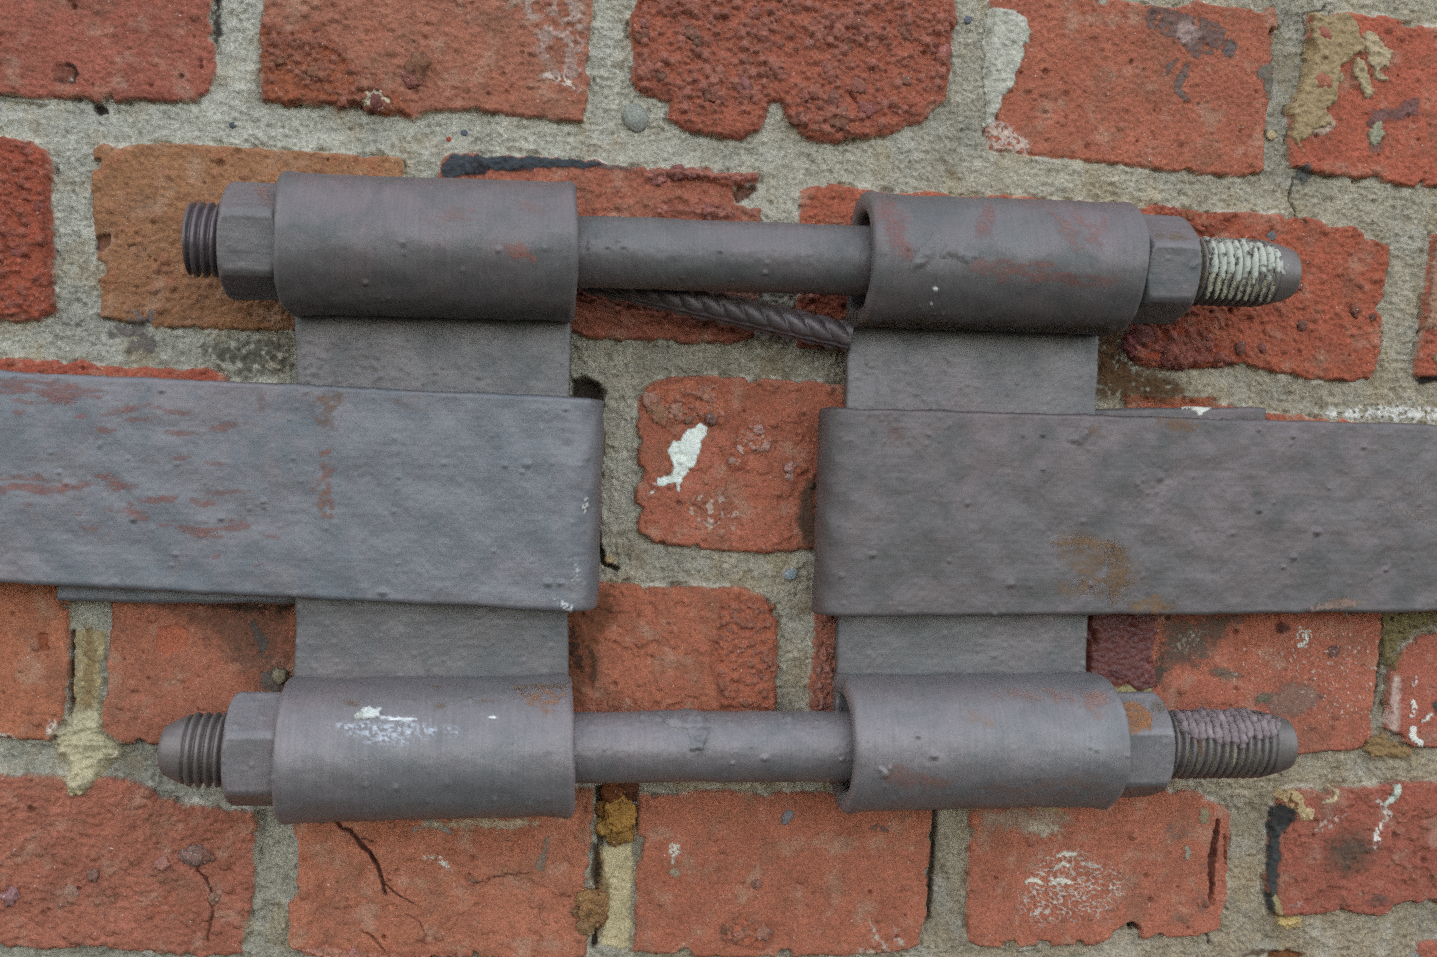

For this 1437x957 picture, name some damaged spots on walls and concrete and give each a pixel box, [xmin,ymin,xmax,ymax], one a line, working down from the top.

peeling [1315,30,1393,99]
spalling [1368,120,1386,145]
spalling [642,378,774,470]
crack [179,859,214,936]
crack [336,822,426,938]
damp [1023,851,1122,921]
crack [1204,819,1227,942]